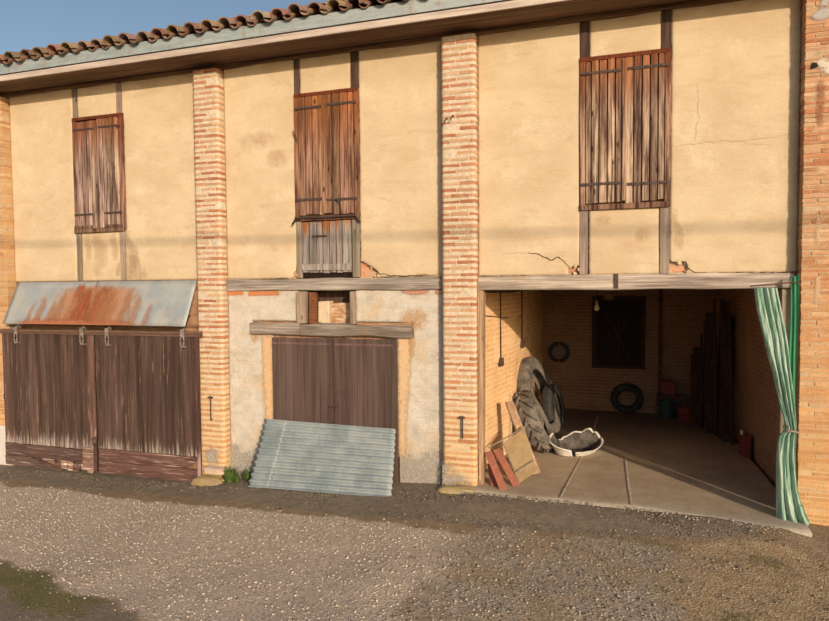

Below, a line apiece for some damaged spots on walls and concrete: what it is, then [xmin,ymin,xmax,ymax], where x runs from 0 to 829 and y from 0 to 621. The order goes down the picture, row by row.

spalling [360,262,383,278]
crack [509,252,571,268]
spalling [668,261,687,274]
corrosion [21,285,136,325]